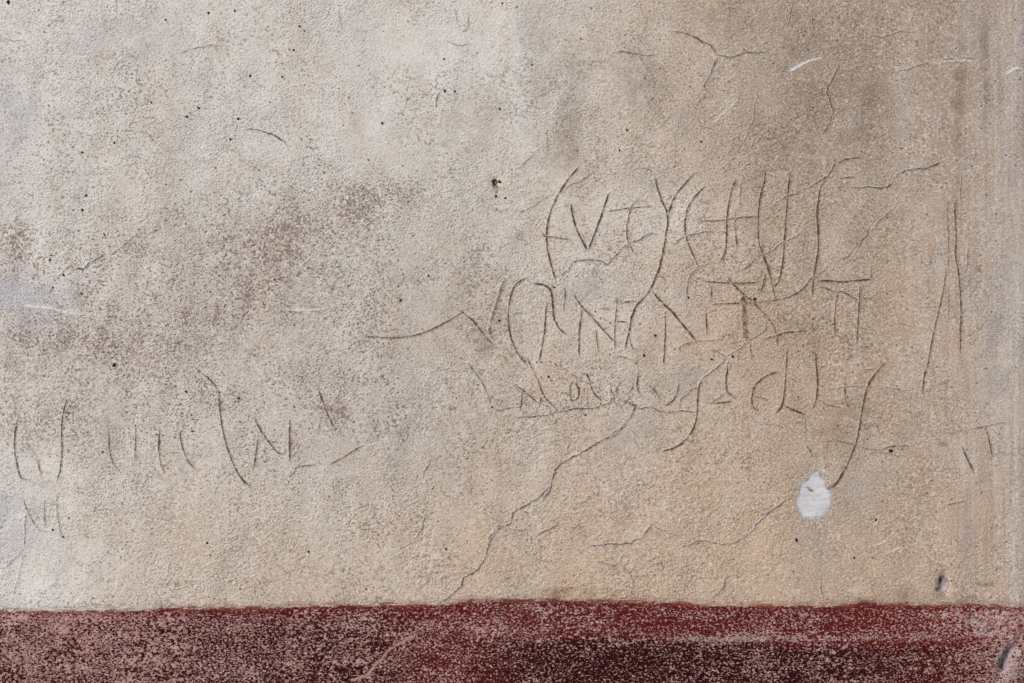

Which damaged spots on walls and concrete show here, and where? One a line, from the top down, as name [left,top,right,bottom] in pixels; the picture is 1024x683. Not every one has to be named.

crack [587,50,657,65]
crack [668,29,768,131]
crack [800,11,916,134]
crack [896,56,976,74]
crack [441,156,943,604]